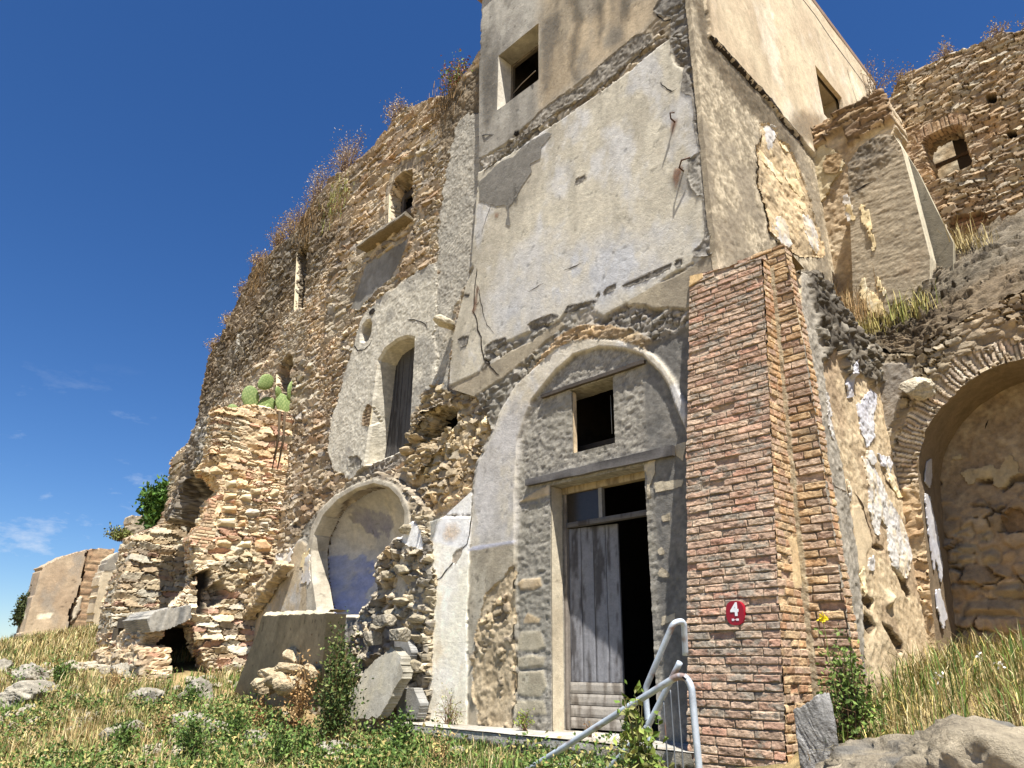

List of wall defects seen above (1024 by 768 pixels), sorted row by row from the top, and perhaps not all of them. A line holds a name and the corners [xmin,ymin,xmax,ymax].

flaking render [756,122,846,258]
crack [472,271,499,375]
spalling [484,338,507,353]
crack [437,516,472,580]
flaking render [469,566,518,734]